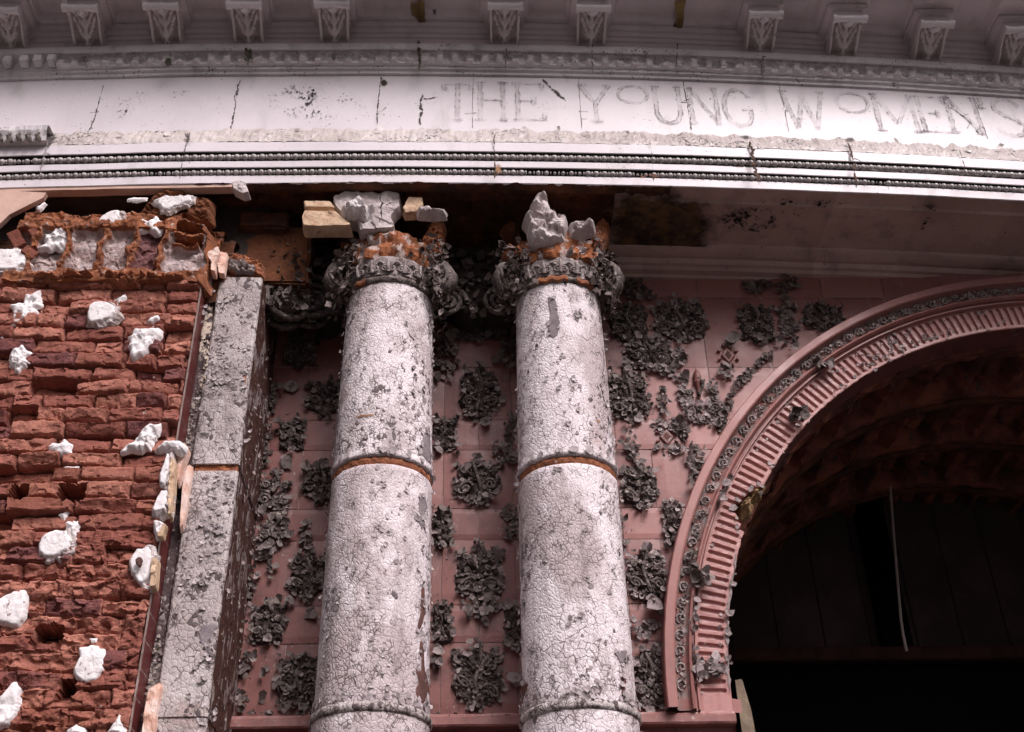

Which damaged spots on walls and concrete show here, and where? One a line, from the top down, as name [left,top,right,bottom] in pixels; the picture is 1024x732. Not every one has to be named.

crack [81,55,104,130]
crack [230,43,254,128]
crack [749,141,763,183]
spalling [1,211,1024,732]